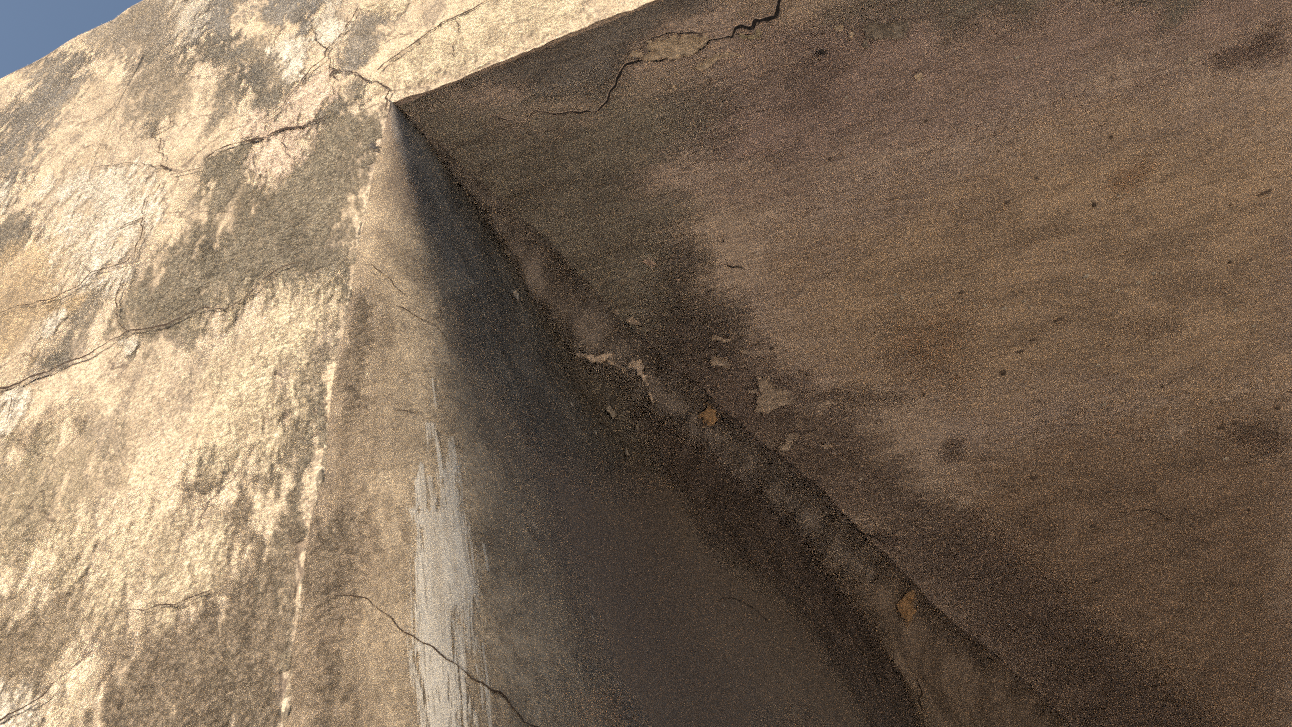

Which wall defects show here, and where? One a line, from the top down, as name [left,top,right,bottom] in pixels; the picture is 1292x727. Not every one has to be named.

crack [489,0,782,123]
leakage [399,0,1291,727]
crack [332,594,538,727]